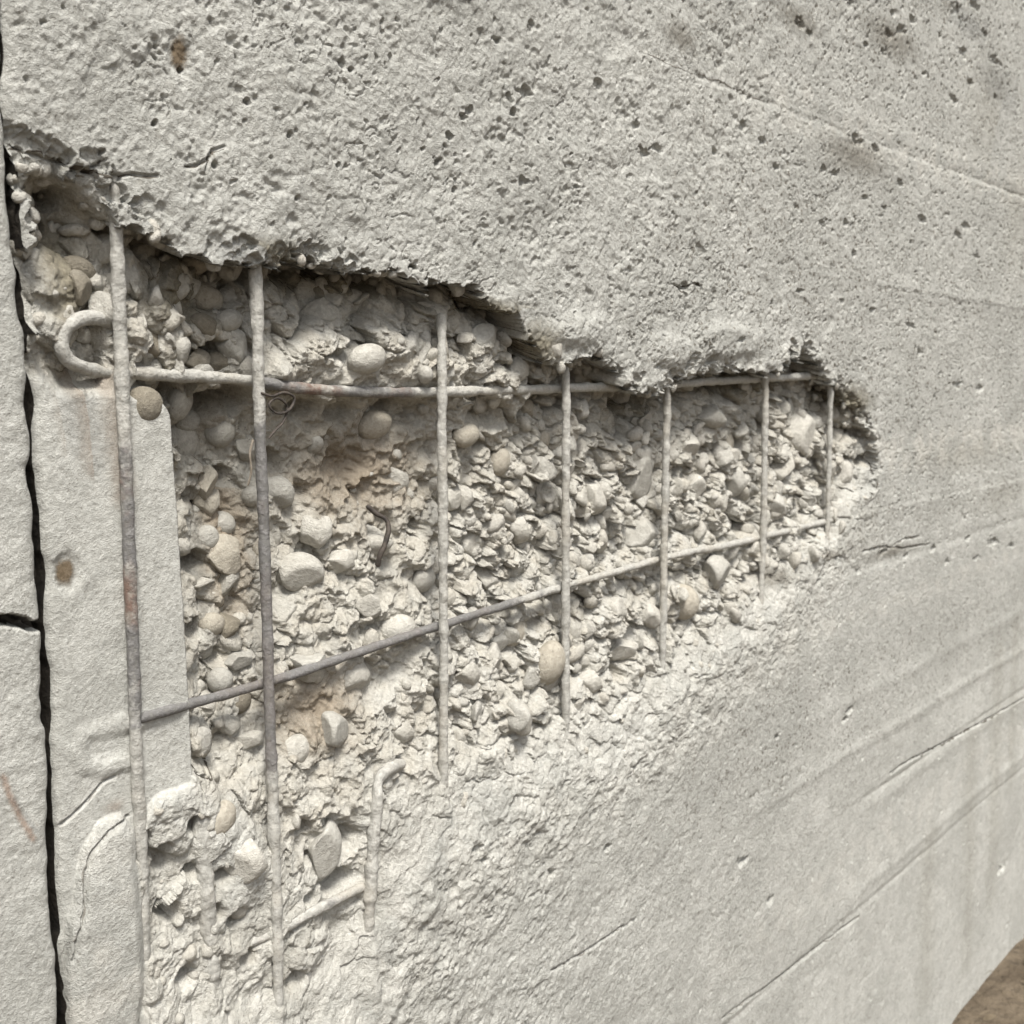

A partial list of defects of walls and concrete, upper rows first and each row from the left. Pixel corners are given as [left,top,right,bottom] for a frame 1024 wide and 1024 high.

hole [334,54,356,74]
hole [593,76,604,92]
hole [459,104,475,122]
hole [502,82,535,117]
hole [631,117,671,164]
hole [737,118,769,146]
hole [847,130,883,154]
hole [944,211,972,242]
hole [972,533,1017,562]
rust [56,560,73,582]
spalling [5,142,879,1024]
crack [0,614,31,629]